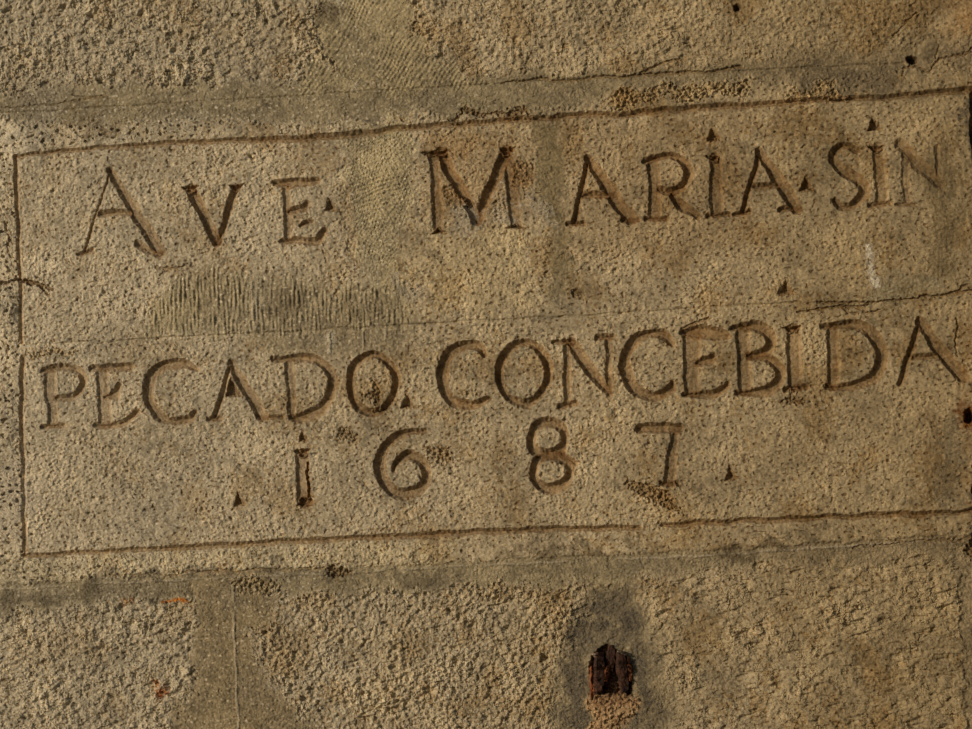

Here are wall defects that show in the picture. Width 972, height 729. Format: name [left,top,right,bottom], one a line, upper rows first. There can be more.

crack [0,222,54,296]
spalling [585,689,642,729]